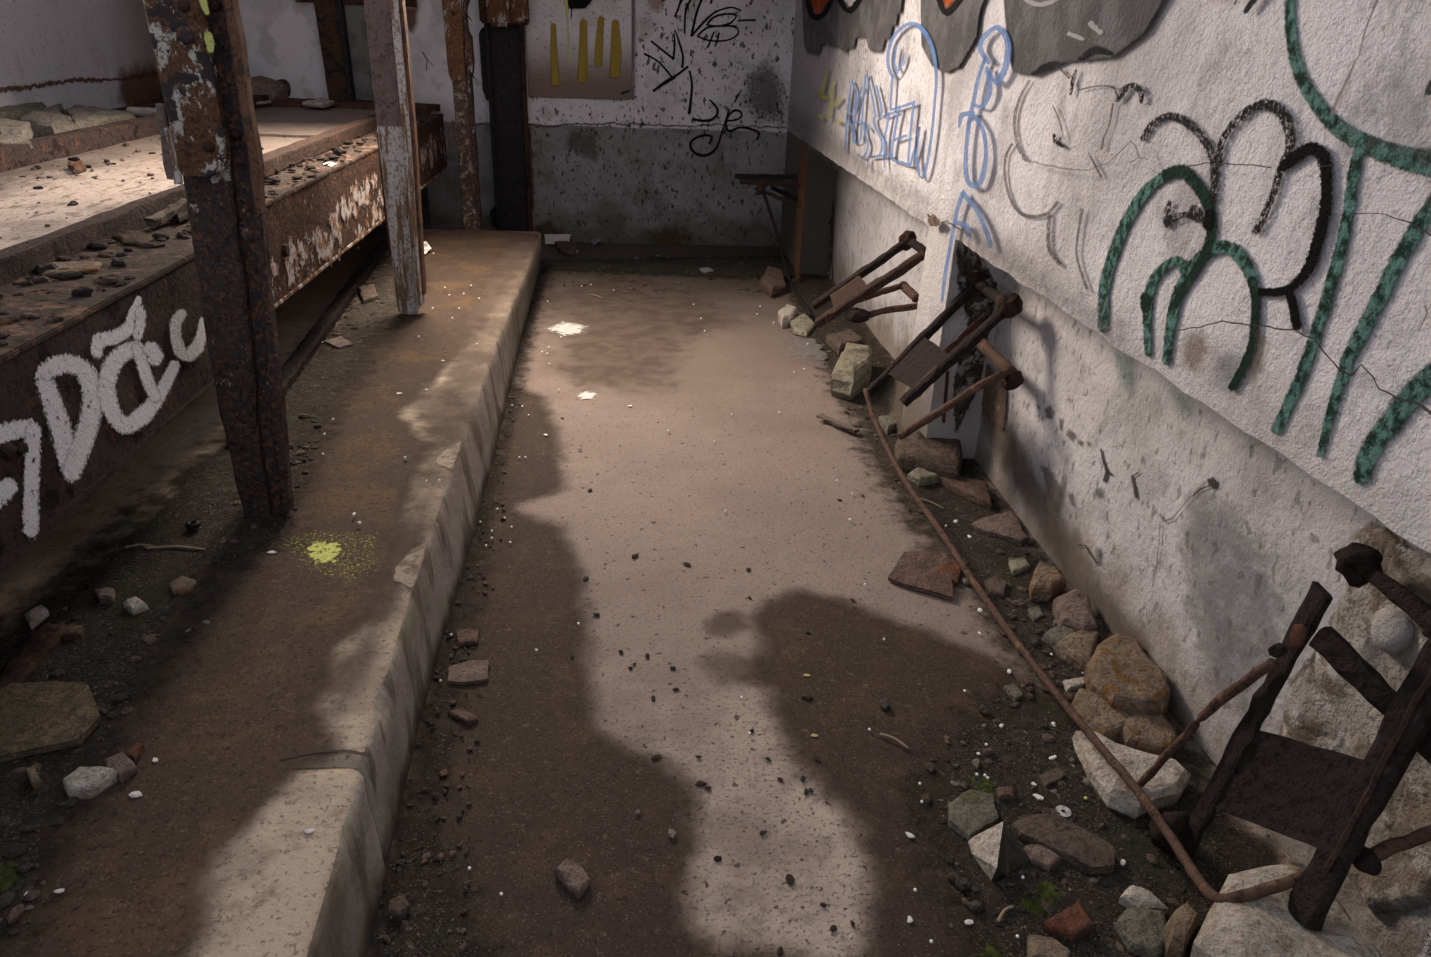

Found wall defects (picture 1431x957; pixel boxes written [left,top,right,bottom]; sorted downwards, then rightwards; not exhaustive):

rust [0,66,162,106]
crack [1330,0,1378,115]
rust [19,138,162,227]
rust [264,129,378,198]
crack [1022,140,1148,171]
crack [1181,162,1271,173]
rust [0,210,191,347]
spalling [944,243,1007,433]
crack [1179,320,1431,415]
spalling [1330,523,1431,692]
spalling [1279,651,1384,760]
spalling [1347,752,1431,916]